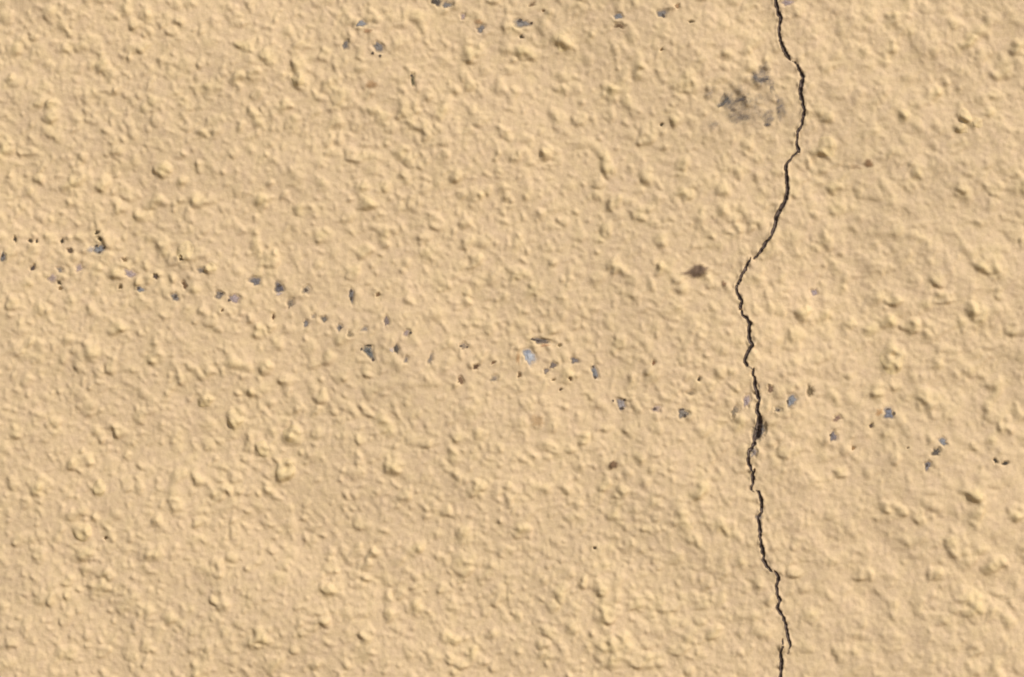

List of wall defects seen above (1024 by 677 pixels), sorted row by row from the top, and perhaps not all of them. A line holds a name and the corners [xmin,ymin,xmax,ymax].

crack [735,0,806,677]